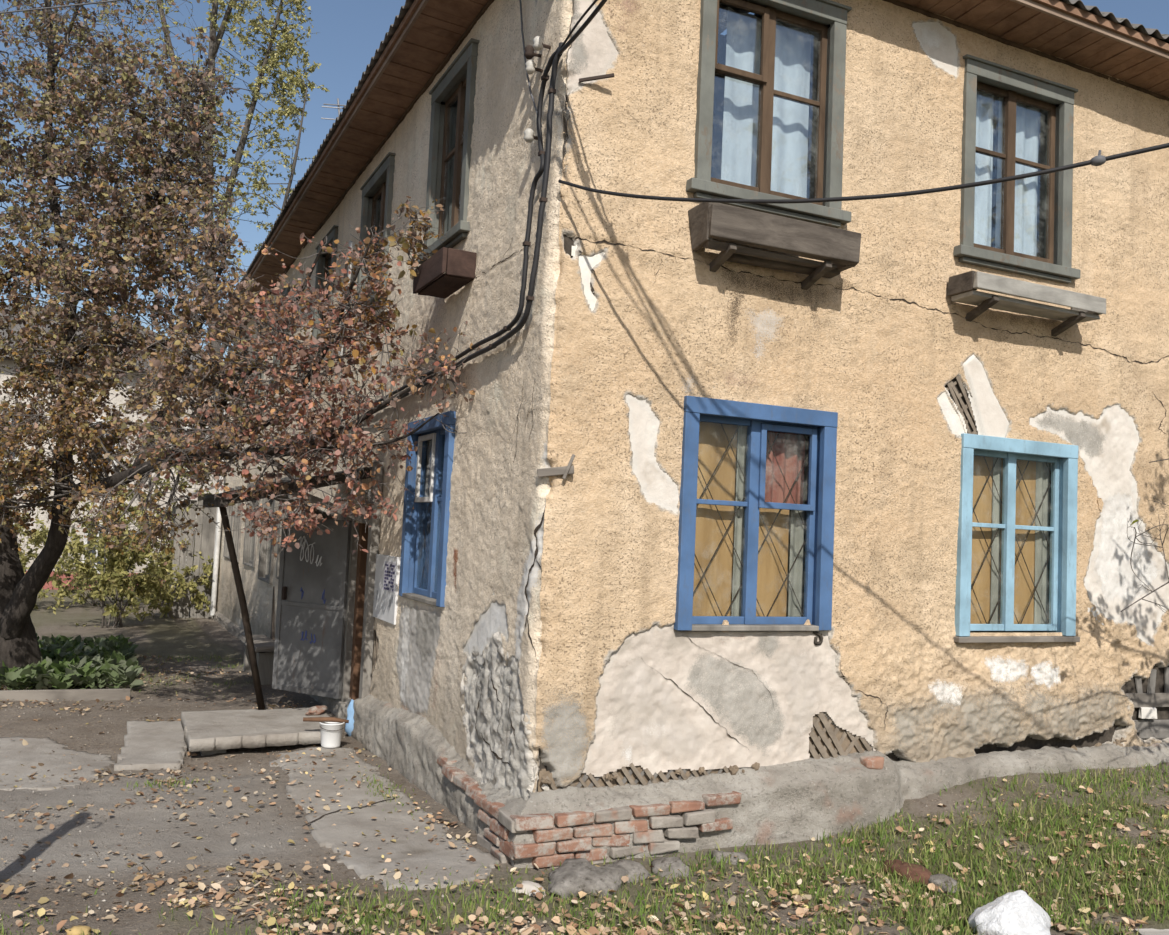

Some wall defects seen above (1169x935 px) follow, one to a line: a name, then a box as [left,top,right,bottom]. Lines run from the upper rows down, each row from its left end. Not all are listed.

peeling [567,0,619,95]
peeling [912,22,958,76]
spalling [563,235,605,311]
crack [563,233,1169,364]
peeling [626,394,679,512]
peeling [937,388,967,436]
crack [523,503,546,657]
peeling [1029,405,1169,644]
flaking render [437,592,742,869]
flaking render [582,619,876,777]